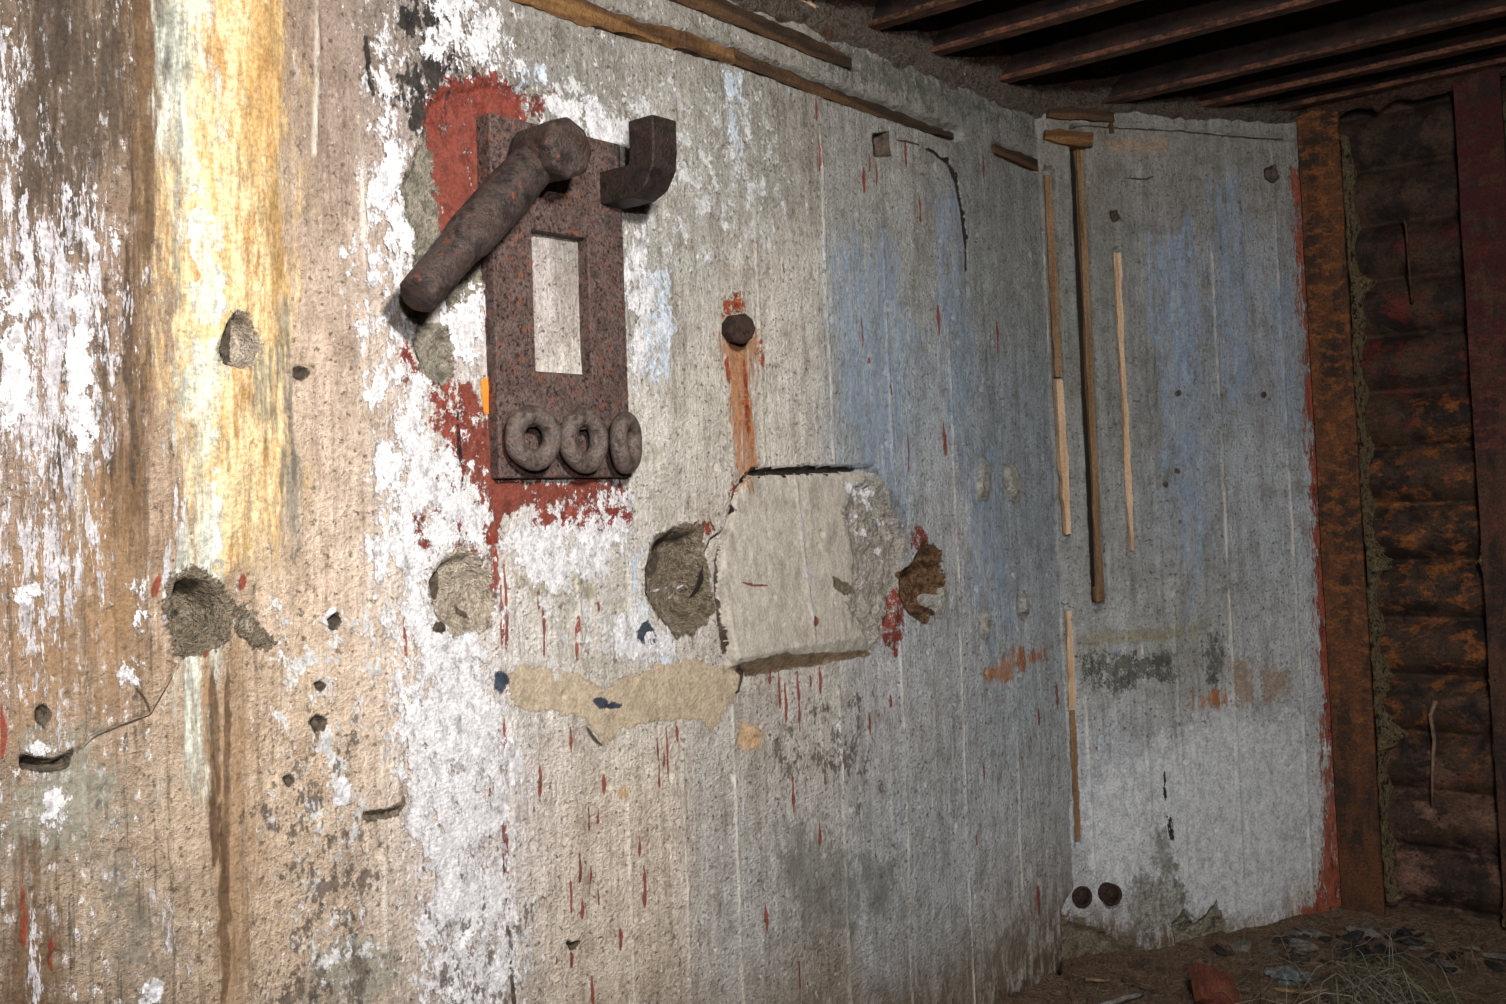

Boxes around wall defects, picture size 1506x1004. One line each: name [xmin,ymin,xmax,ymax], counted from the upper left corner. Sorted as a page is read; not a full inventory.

crack [896,139,968,272]
crack [85,661,182,746]
spalling [151,563,277,659]
spalling [215,305,265,373]
damp [0,0,679,1004]
peeling [393,259,634,641]
spalling [637,514,718,645]
corrosion [719,291,766,493]
spalling [841,473,950,662]
corrosion [1288,165,1342,915]